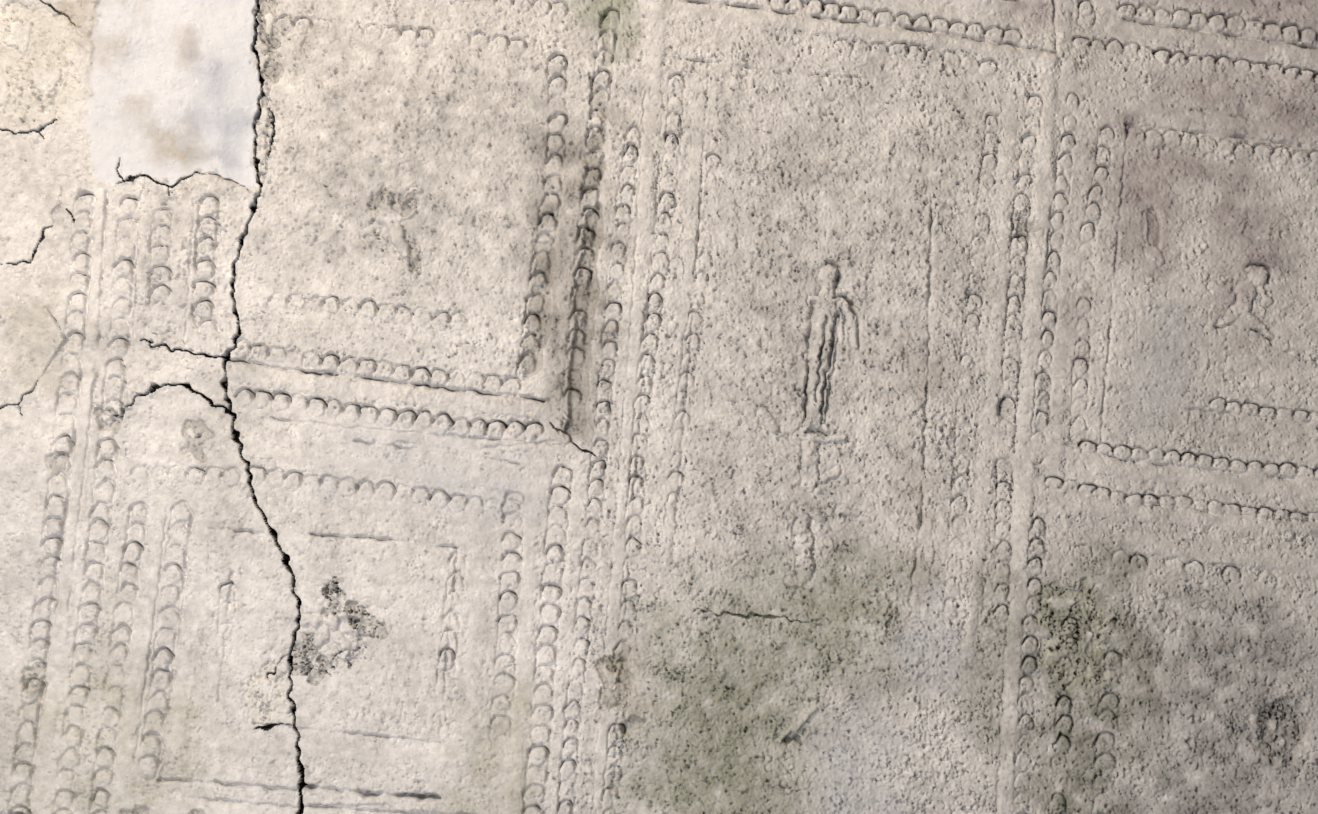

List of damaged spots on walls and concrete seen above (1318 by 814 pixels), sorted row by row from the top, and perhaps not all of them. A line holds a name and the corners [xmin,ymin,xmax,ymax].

crack [40,0,76,27]
crack [0,119,58,139]
crack [6,208,76,266]
crack [116,0,307,814]